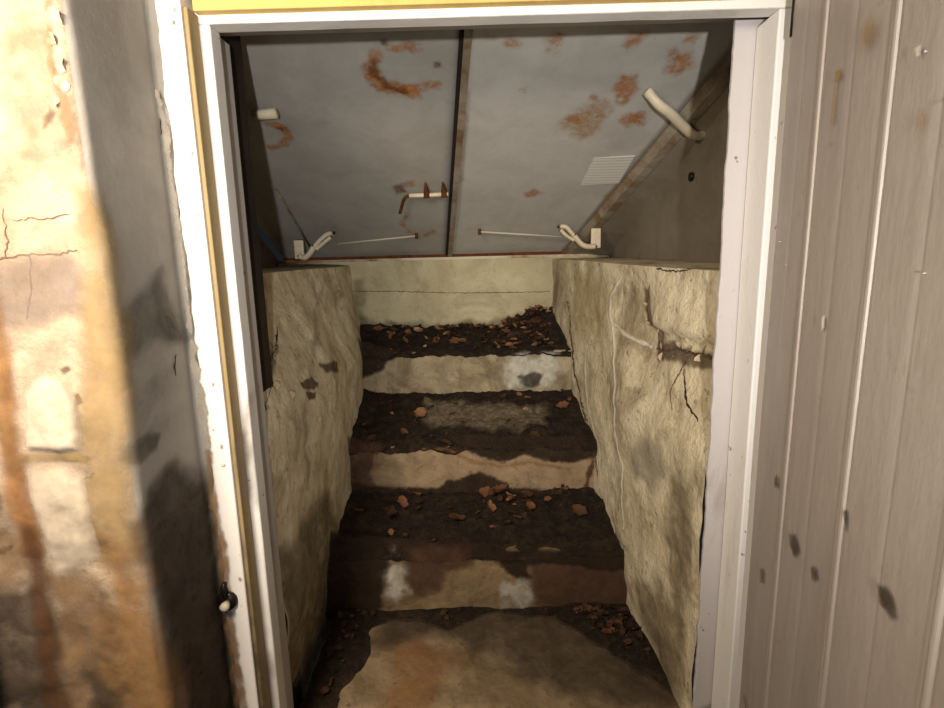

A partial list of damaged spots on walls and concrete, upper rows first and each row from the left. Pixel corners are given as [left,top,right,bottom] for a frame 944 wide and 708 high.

corrosion [364,41,440,98]
corrosion [615,76,635,103]
crack [0,208,77,319]
crack [648,324,702,422]